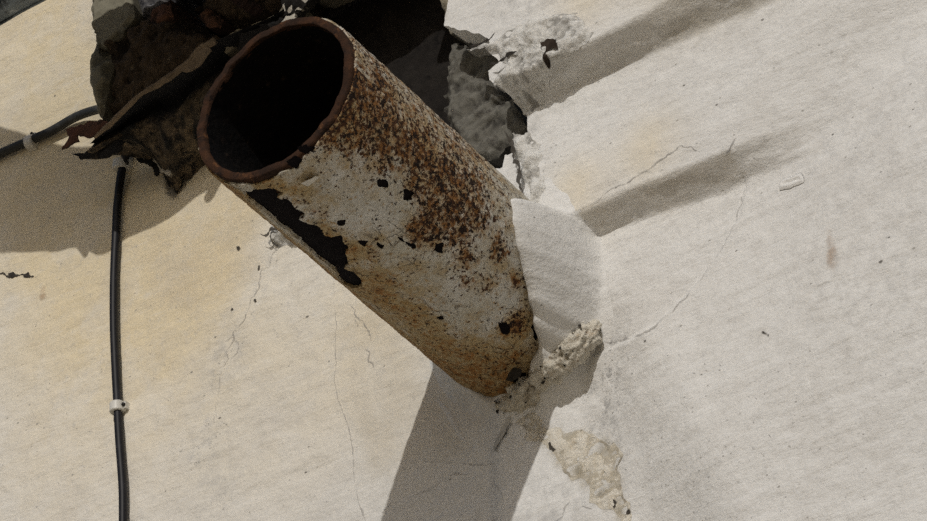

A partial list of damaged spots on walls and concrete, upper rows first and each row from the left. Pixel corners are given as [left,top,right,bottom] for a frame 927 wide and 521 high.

peeling [206,12,632,521]